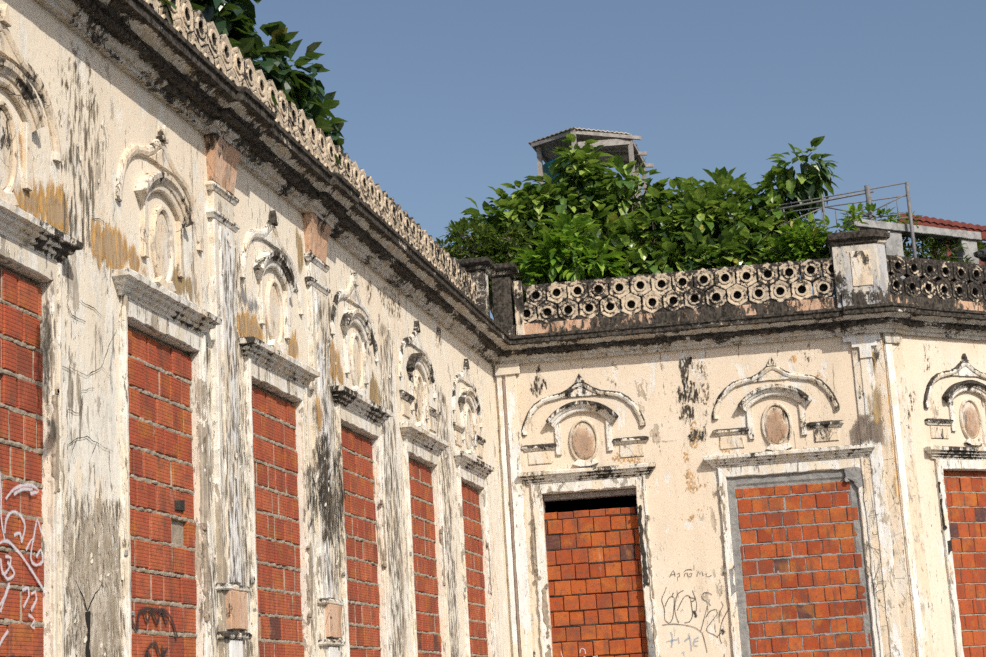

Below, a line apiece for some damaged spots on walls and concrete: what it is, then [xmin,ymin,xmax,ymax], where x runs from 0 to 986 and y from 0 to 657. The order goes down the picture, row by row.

leakage [253,230,303,298]
leakage [340,281,401,348]
leakage [677,357,709,442]
leakage [852,349,884,445]
leakage [307,432,346,551]